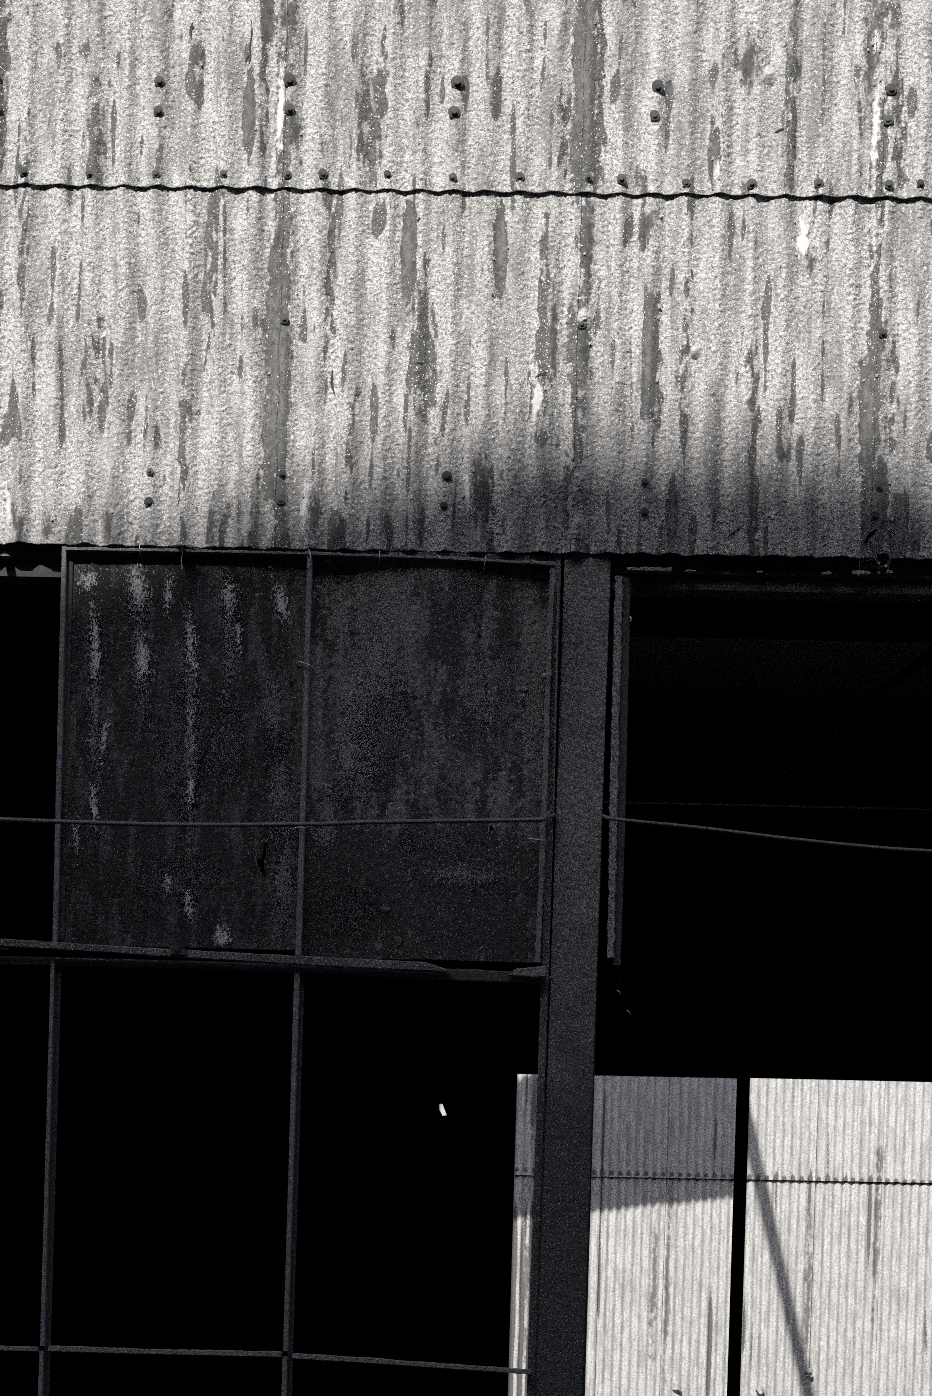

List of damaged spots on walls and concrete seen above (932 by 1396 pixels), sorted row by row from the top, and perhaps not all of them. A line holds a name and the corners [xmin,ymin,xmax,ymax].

rust [147,660,246,821]
rust [436,556,522,769]